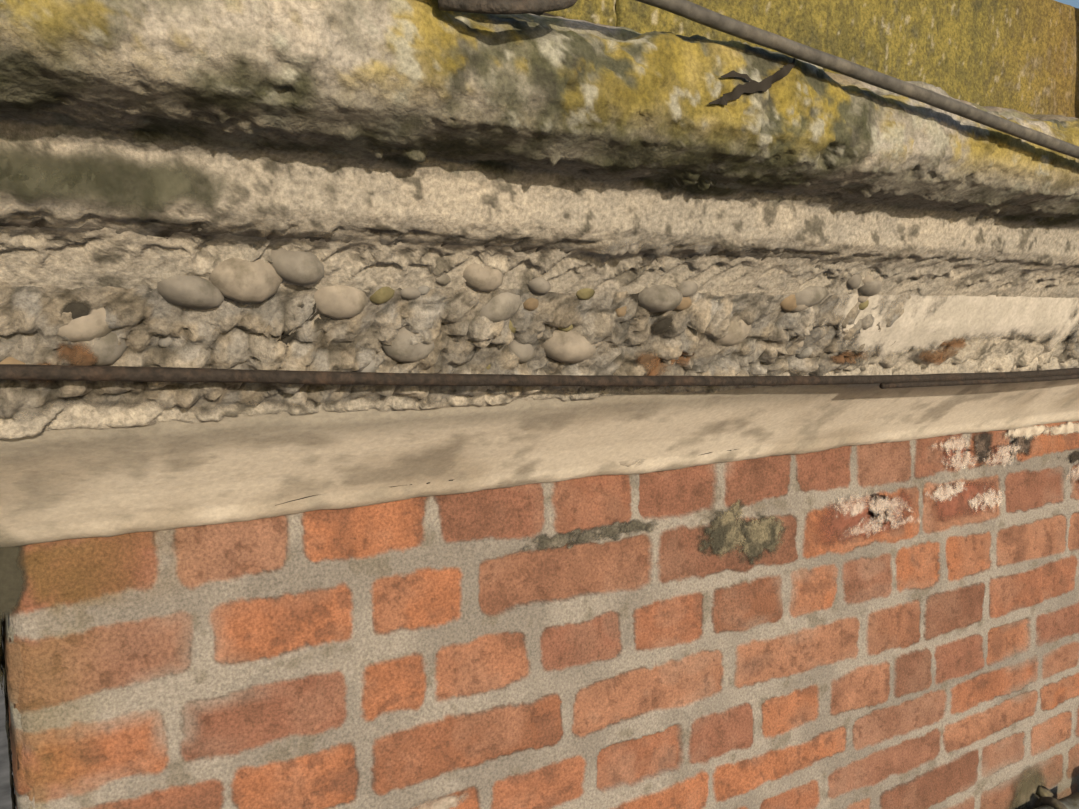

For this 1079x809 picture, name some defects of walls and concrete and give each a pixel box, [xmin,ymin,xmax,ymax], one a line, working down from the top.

spalling [0,216,911,418]
peeling [1006,422,1079,438]